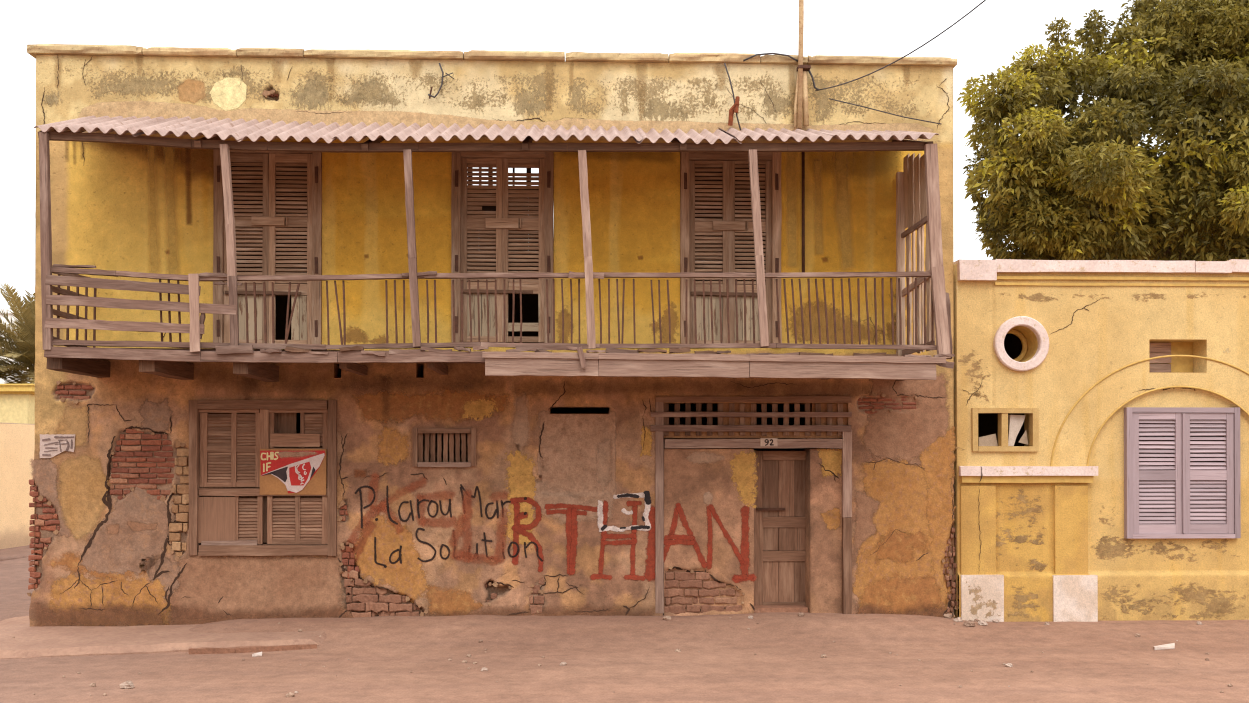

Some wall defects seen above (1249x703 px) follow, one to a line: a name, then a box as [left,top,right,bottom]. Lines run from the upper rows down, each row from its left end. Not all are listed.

crack [41,55,93,123]
crack [60,404,230,615]
peeling [27,380,509,625]
flaking render [664,566,745,614]
peeling [852,374,1046,618]
peeling [1103,582,1246,619]